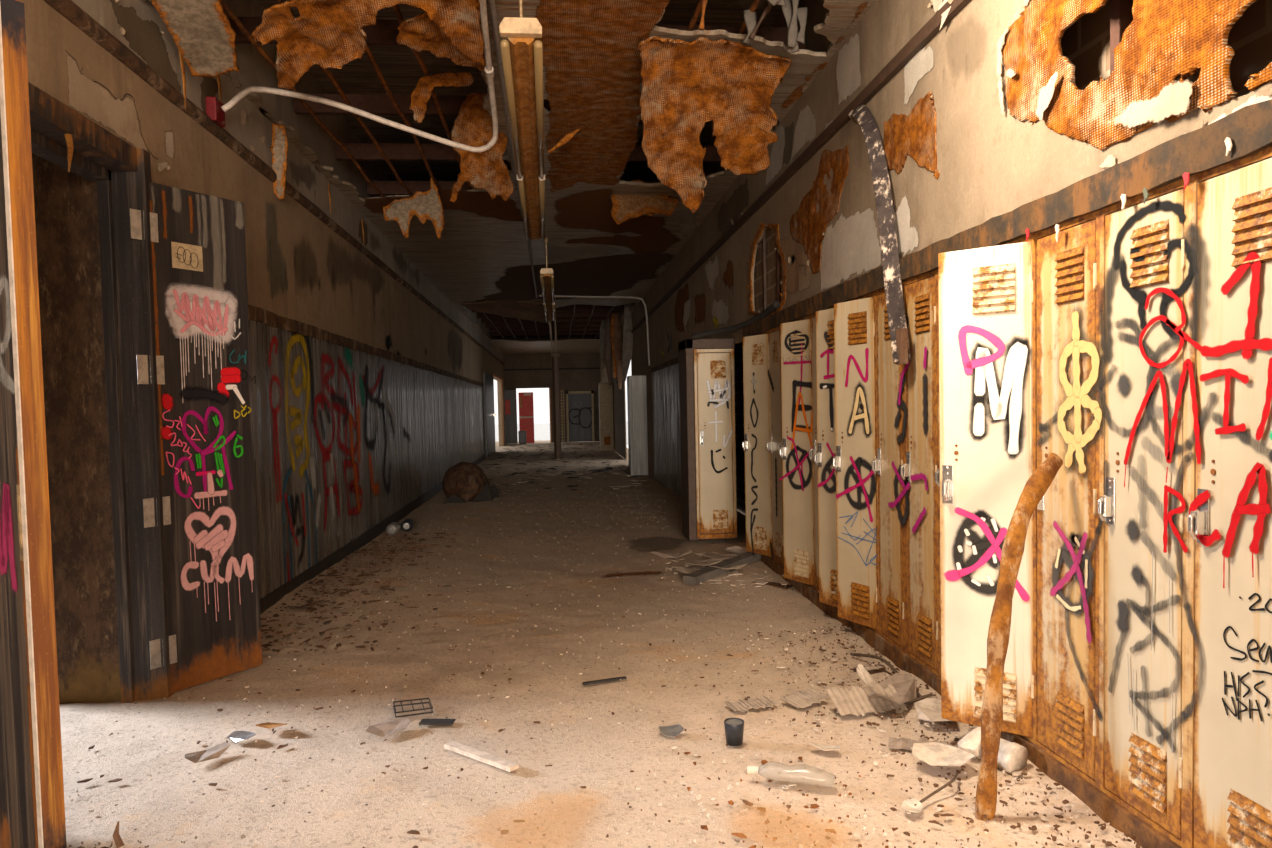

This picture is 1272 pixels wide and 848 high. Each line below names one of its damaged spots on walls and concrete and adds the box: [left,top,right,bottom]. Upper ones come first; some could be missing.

peeling [927,0,954,29]
peeling [110,0,181,93]
peeling [201,77,219,113]
peeling [836,33,861,105]
peeling [904,46,934,105]
spalling [1180,86,1272,136]
peeling [766,105,833,185]